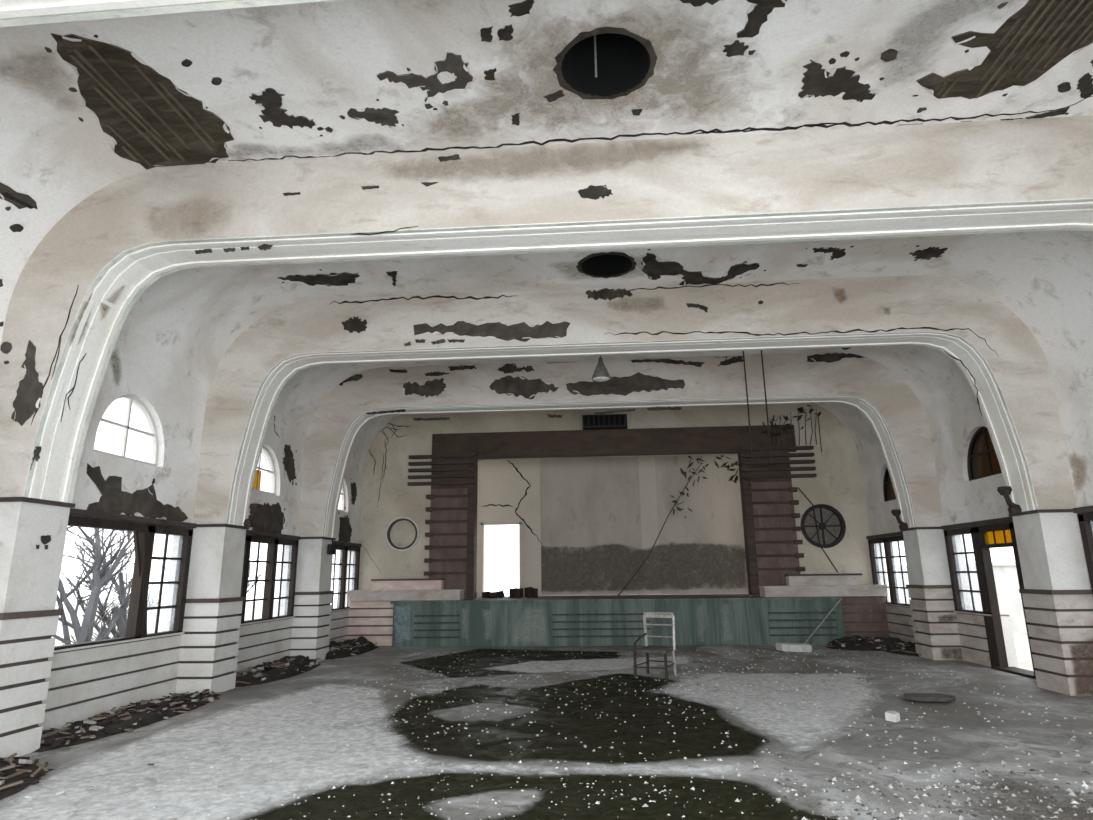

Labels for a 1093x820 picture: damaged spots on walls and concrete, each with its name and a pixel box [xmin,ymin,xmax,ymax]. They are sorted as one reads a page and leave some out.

spalling [45,22,234,170]
peeling [249,88,333,136]
peeling [377,53,497,110]
damp [433,16,726,134]
peeling [798,51,885,102]
spalling [905,0,1093,125]
peeling [641,249,766,286]
spalling [404,321,570,346]
peeling [0,340,43,426]
peeling [86,463,188,522]
crack [481,460,544,547]
damp [0,637,873,820]